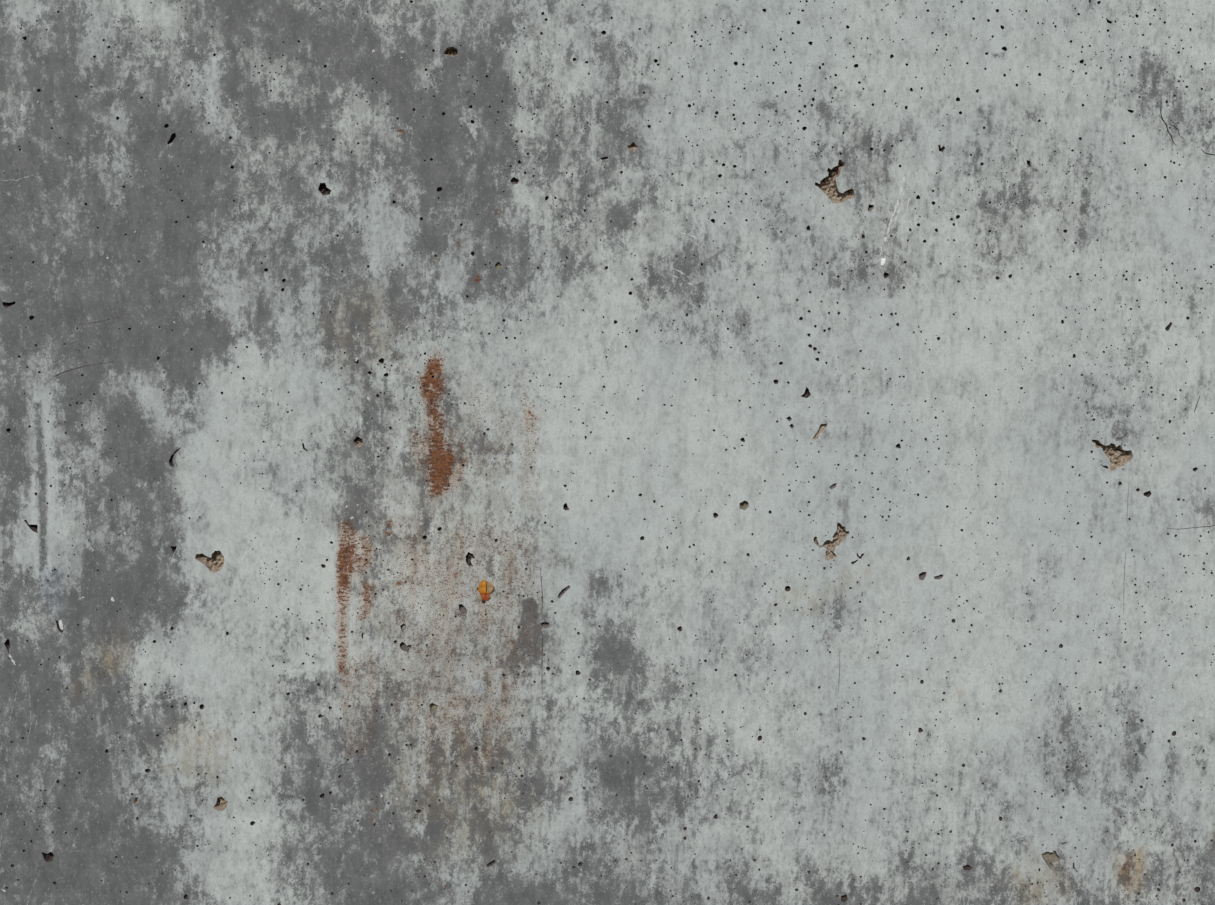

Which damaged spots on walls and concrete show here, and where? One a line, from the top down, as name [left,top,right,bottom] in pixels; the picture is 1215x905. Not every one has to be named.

spalling [815,160,855,204]
water stain [635,213,724,321]
water stain [0,0,690,905]
spalling [1092,440,1133,471]
corrosion [328,333,559,798]
spalling [814,522,849,561]
water stain [262,561,1215,905]